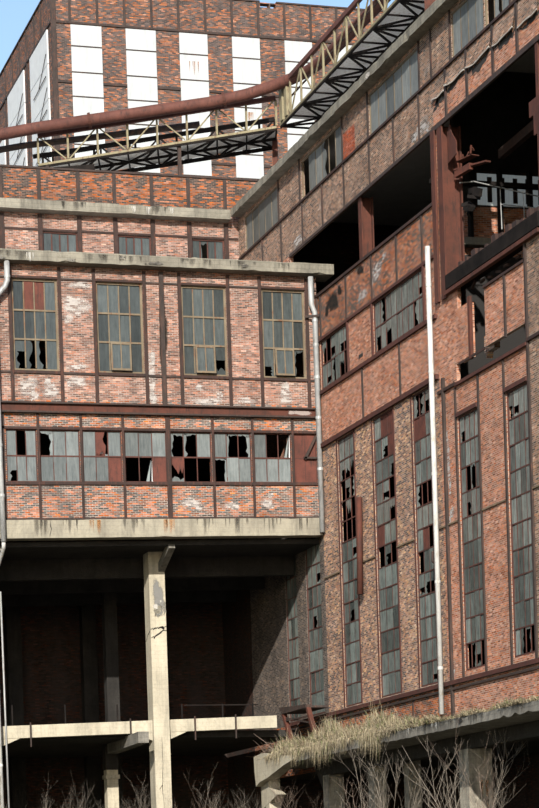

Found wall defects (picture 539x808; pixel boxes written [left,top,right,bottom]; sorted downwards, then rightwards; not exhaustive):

leakage [64,296,90,323]
leakage [67,365,86,387]
leakage [21,378,58,401]
crack [146,626,166,641]